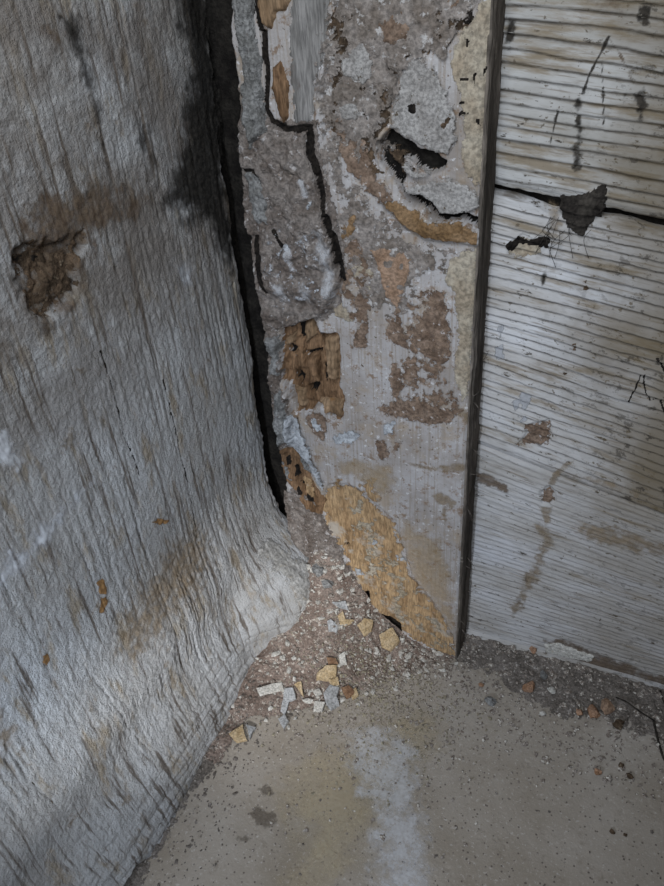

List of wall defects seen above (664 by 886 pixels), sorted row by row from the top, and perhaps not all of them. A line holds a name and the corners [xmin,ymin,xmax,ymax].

crack [255,0,346,281]
peeling [289,0,491,214]
water stain [14,184,138,310]
crack [206,0,287,517]
peeling [264,335,298,376]
peeling [272,391,360,502]
peeling [331,215,477,461]
peeling [505,236,550,258]
peeling [512,392,551,446]
peeling [231,553,458,729]